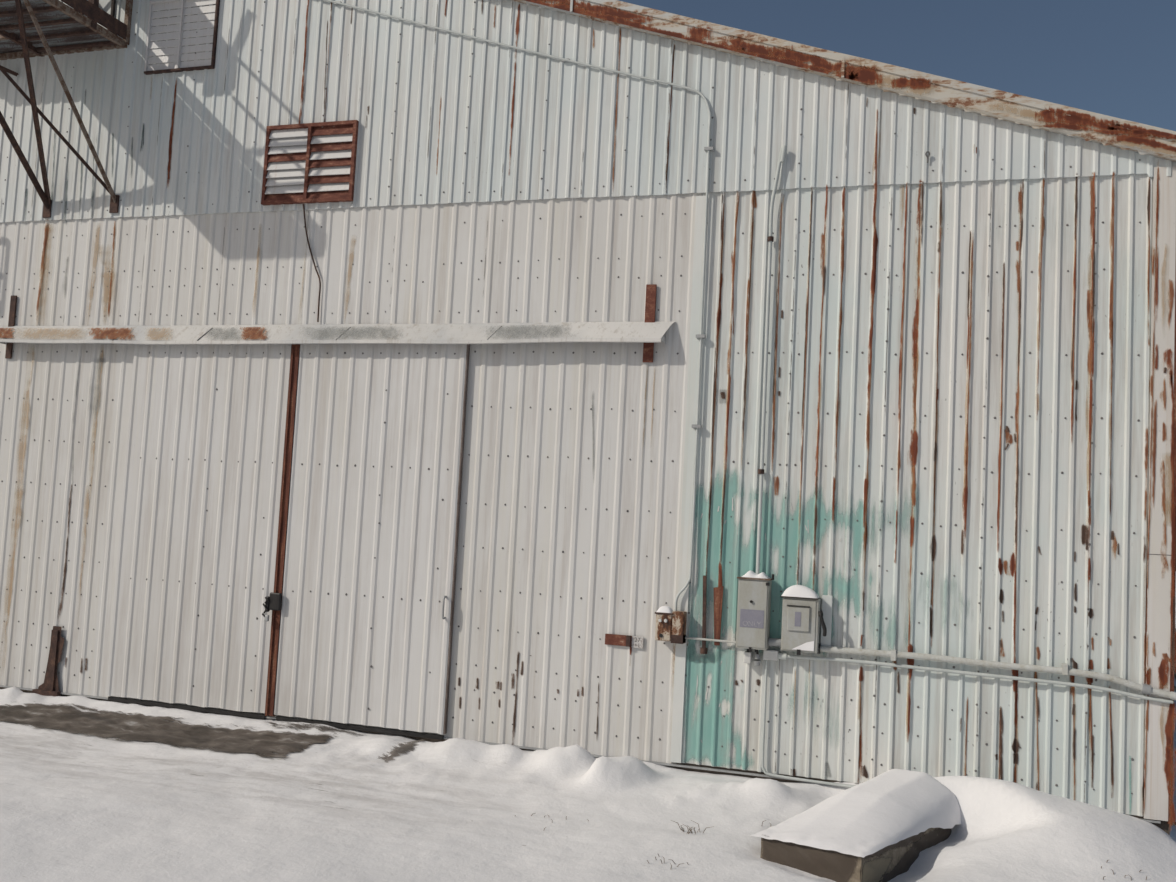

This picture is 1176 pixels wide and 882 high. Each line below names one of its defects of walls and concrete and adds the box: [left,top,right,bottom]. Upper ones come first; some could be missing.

corrosion [0,223,134,340]
peeling [685,470,918,770]
corrosion [799,185,828,584]
corrosion [835,188,845,461]
corrosion [863,111,880,574]
corrosion [894,180,924,579]
corrosion [930,182,942,644]
corrosion [961,231,973,554]
corrosion [995,182,1024,783]
corrosion [1070,637,1094,800]
corrosion [997,107,1176,689]
corrosion [1129,700,1176,830]